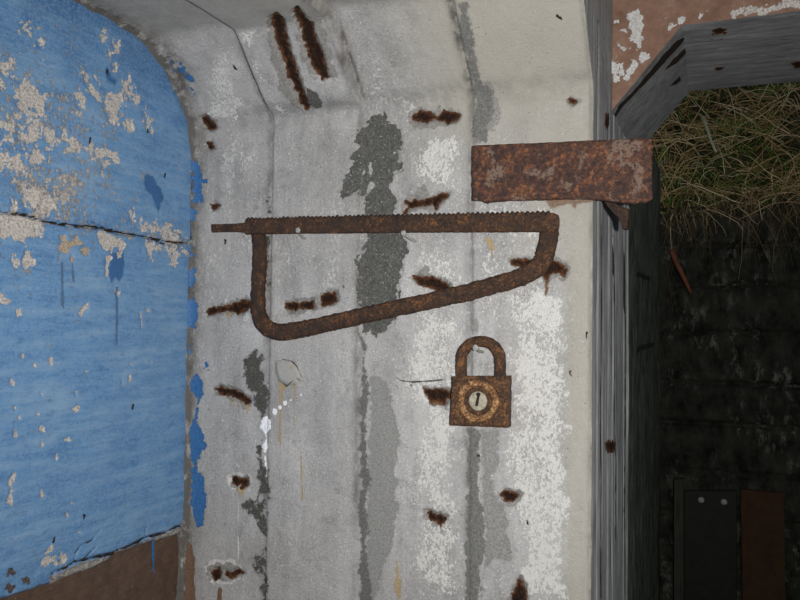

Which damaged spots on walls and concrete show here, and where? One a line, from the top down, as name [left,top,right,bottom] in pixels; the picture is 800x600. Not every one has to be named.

peeling [73,28,154,136]
water stain [458,2,500,143]
peeling [612,8,650,83]
peeling [730,0,800,19]
peeling [0,52,120,270]
crack [4,212,192,246]
peeling [97,230,127,277]
peeling [129,207,189,268]
water stain [241,349,302,537]
water stain [464,428,511,600]
spalling [41,537,110,580]
water stain [252,547,268,600]